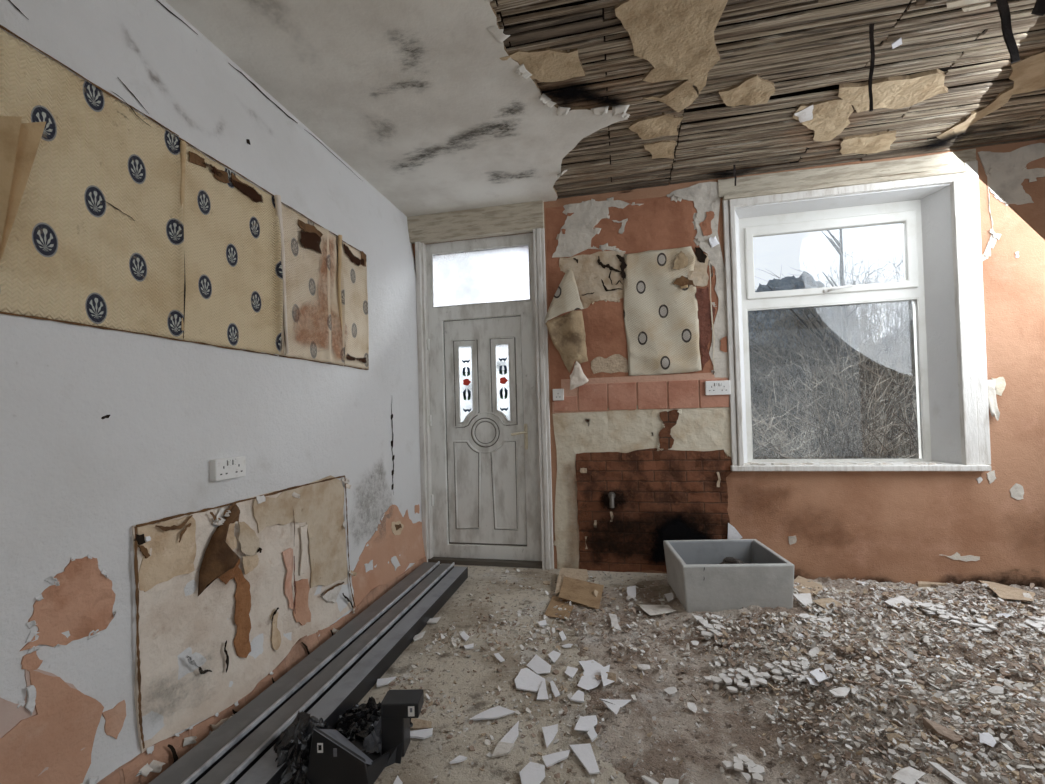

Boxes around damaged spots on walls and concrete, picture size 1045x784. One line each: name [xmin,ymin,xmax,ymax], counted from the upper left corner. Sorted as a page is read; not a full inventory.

leakage [400,106,521,167]
peeling [552,197,642,258]
peeling [666,182,734,378]
peeling [977,143,1045,261]
flaking render [575,409,942,572]
flaking render [0,503,427,784]